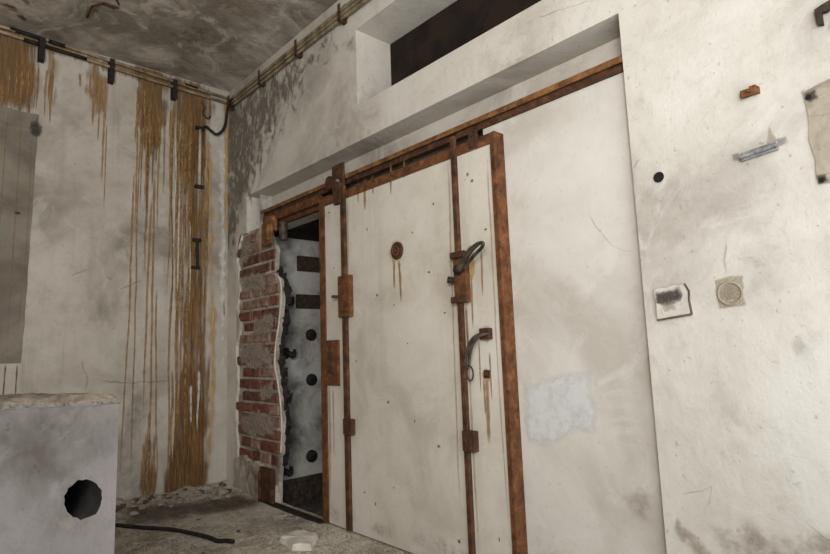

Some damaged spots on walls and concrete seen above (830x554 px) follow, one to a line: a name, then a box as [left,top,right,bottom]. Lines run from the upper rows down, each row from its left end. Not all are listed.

rust [86,0,120,19]
rust [0,28,229,495]
flaking render [233,227,293,504]
water stain [218,55,319,327]
rust [468,246,483,322]
rust [478,347,492,437]